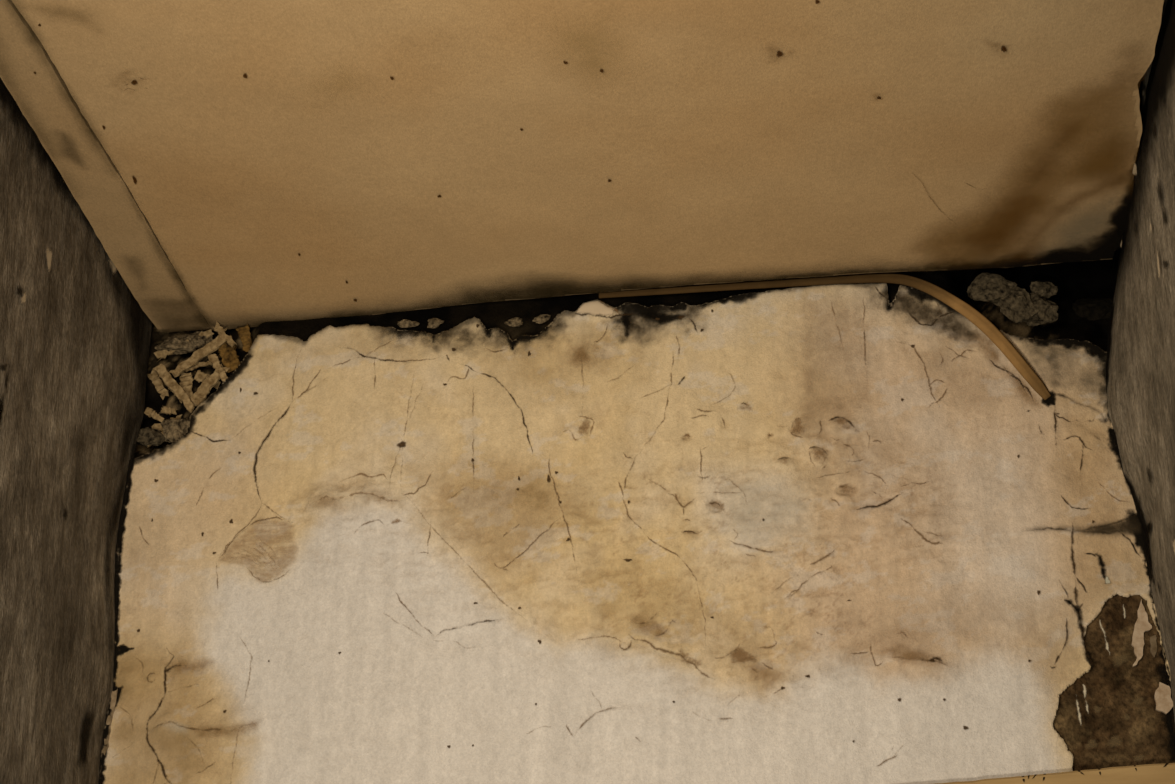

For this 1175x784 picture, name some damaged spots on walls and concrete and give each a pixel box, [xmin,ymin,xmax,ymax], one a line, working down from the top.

leakage [935,0,1175,281]
peeling [577,301,618,315]
crack [912,311,955,402]
crack [99,444,147,784]
crack [146,657,174,781]
crack [216,350,574,586]
crack [857,474,939,544]
crack [1027,394,1170,679]
spalling [1053,553,1175,771]